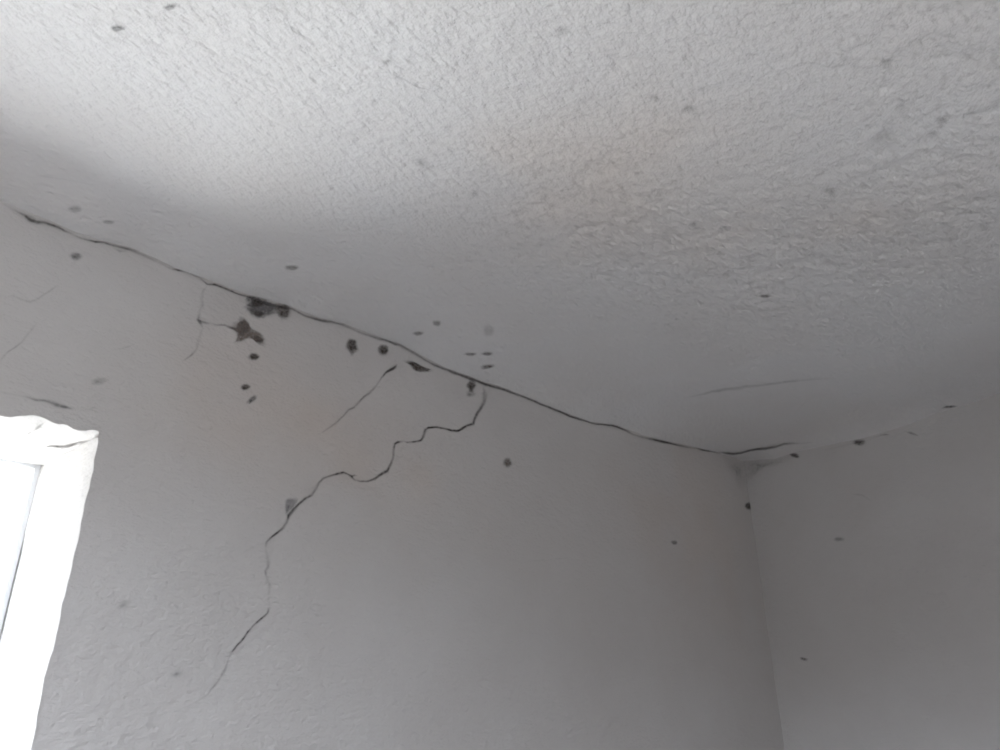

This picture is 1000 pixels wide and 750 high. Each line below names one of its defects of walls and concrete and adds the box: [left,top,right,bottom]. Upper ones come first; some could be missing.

crack [205,282,342,325]
crack [333,337,626,482]
crack [652,439,780,454]
crack [269,496,310,539]